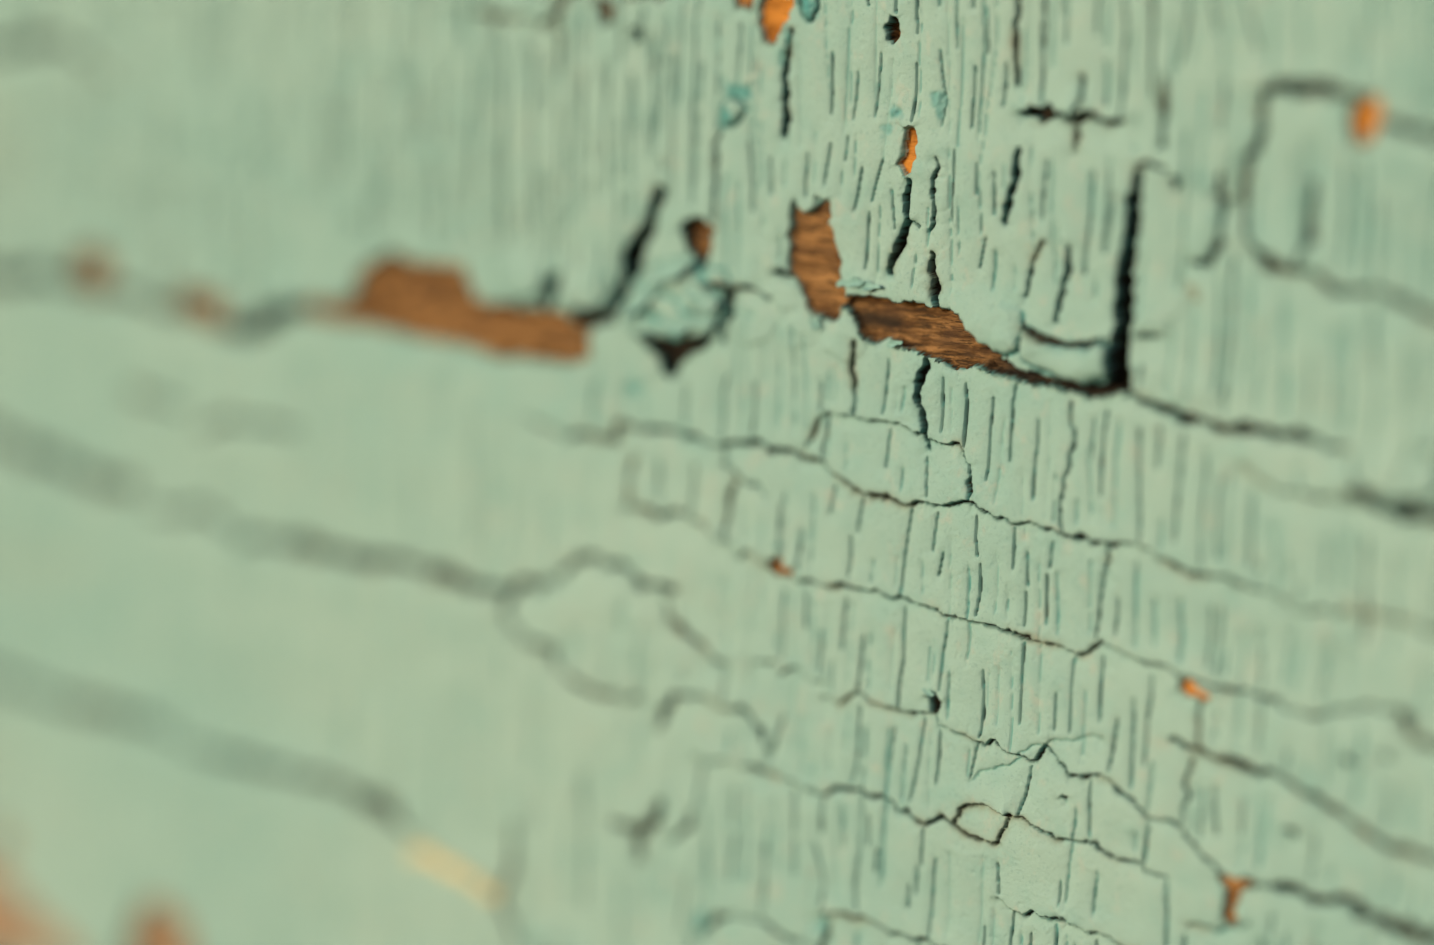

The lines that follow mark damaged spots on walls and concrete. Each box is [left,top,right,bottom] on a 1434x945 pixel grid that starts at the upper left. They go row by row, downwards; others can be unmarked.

peeling [731,0,795,46]
crack [542,0,1168,348]
peeling [895,127,918,181]
crack [1190,79,1434,319]
peeling [1346,91,1385,148]
peeling [294,249,597,368]
peeling [621,216,717,380]
peeling [784,167,1144,401]
crack [501,339,1434,945]
peeling [0,874,75,945]
peeling [125,899,192,945]